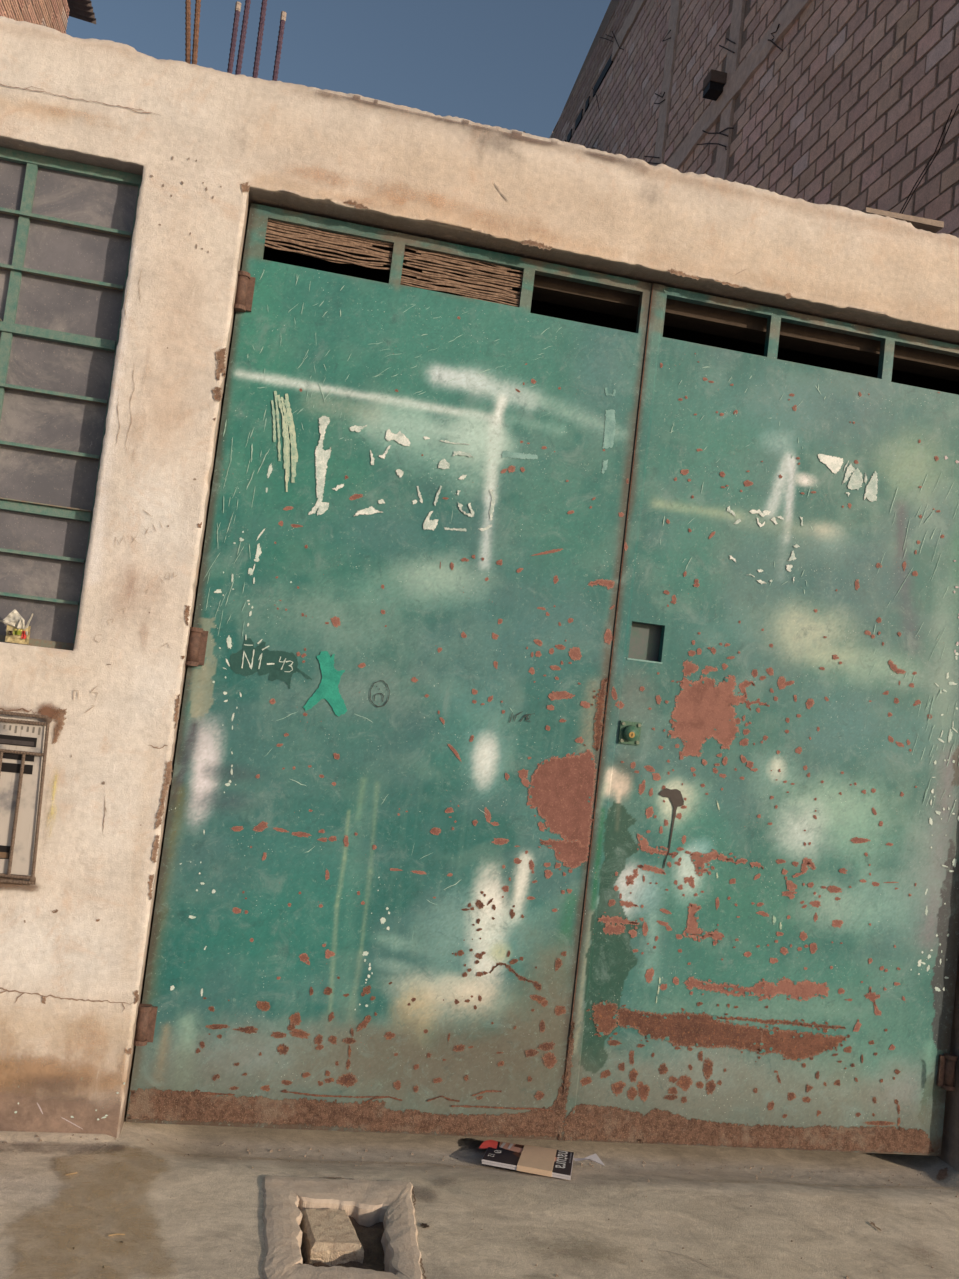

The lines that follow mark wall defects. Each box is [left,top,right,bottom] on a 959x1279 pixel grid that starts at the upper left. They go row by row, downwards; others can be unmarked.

corrosion [38,705,59,736]
corrosion [518,678,608,894]
corrosion [640,641,814,780]
crack [0,987,136,1009]
corrosion [127,811,935,1154]
leakage [0,1060,163,1279]